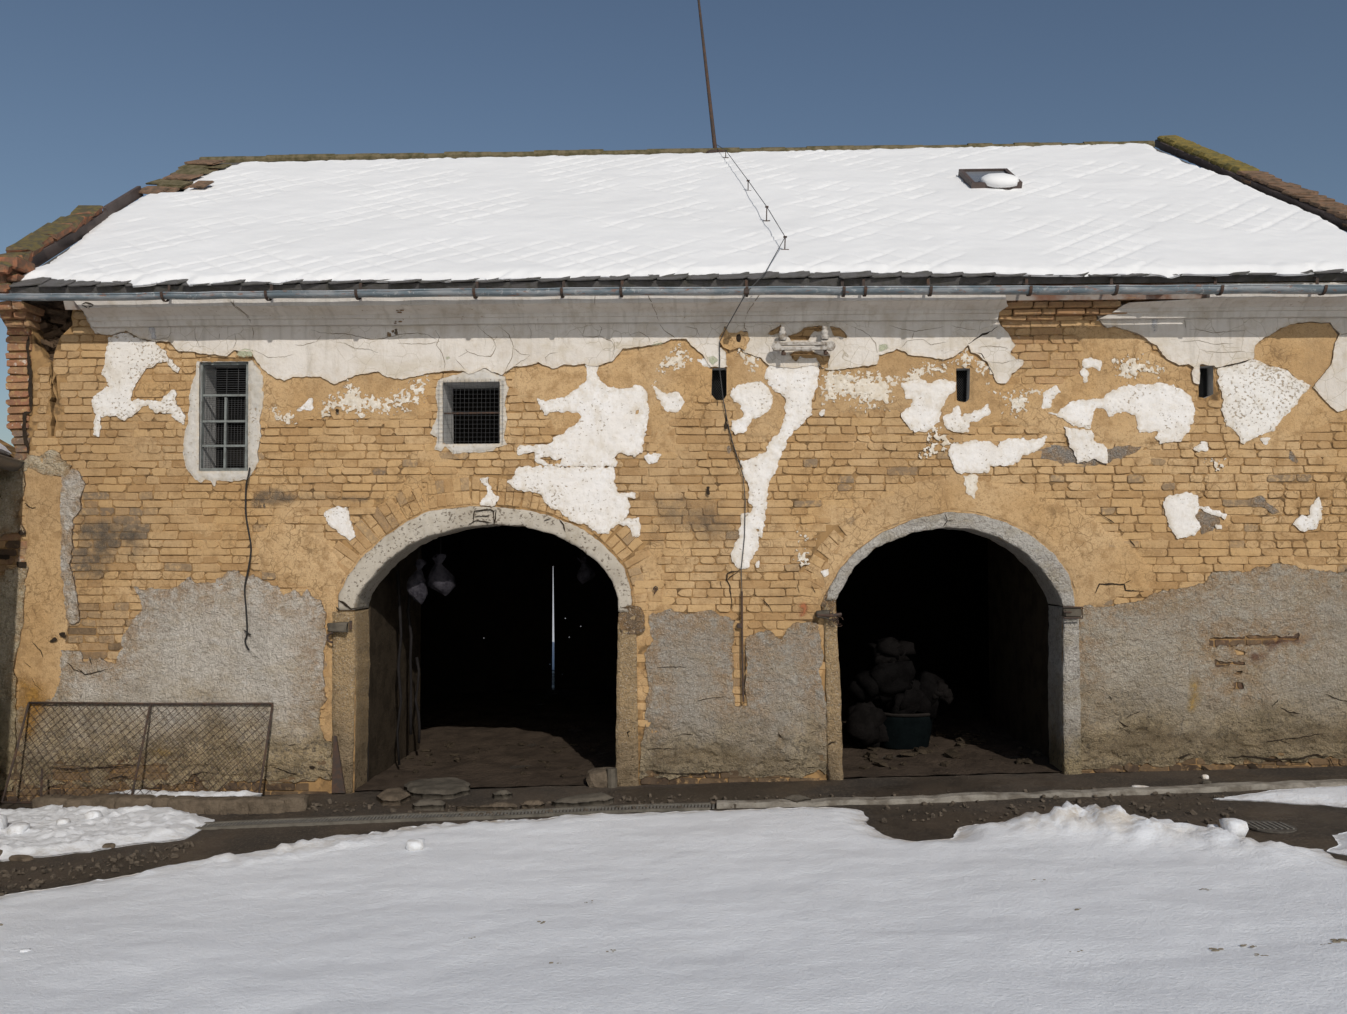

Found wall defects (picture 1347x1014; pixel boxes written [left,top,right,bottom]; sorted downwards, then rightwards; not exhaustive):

crack [22,301,93,454]
flaking render [92,333,186,437]
crack [117,301,551,371]
flaking render [269,375,430,425]
crack [582,296,699,357]
crack [856,325,1009,363]
crack [1183,319,1248,368]
flaking render [1216,323,1337,445]
flaking render [507,343,711,537]
flaking render [719,320,1227,569]
flaking render [324,506,356,541]
flaking render [1292,497,1323,532]